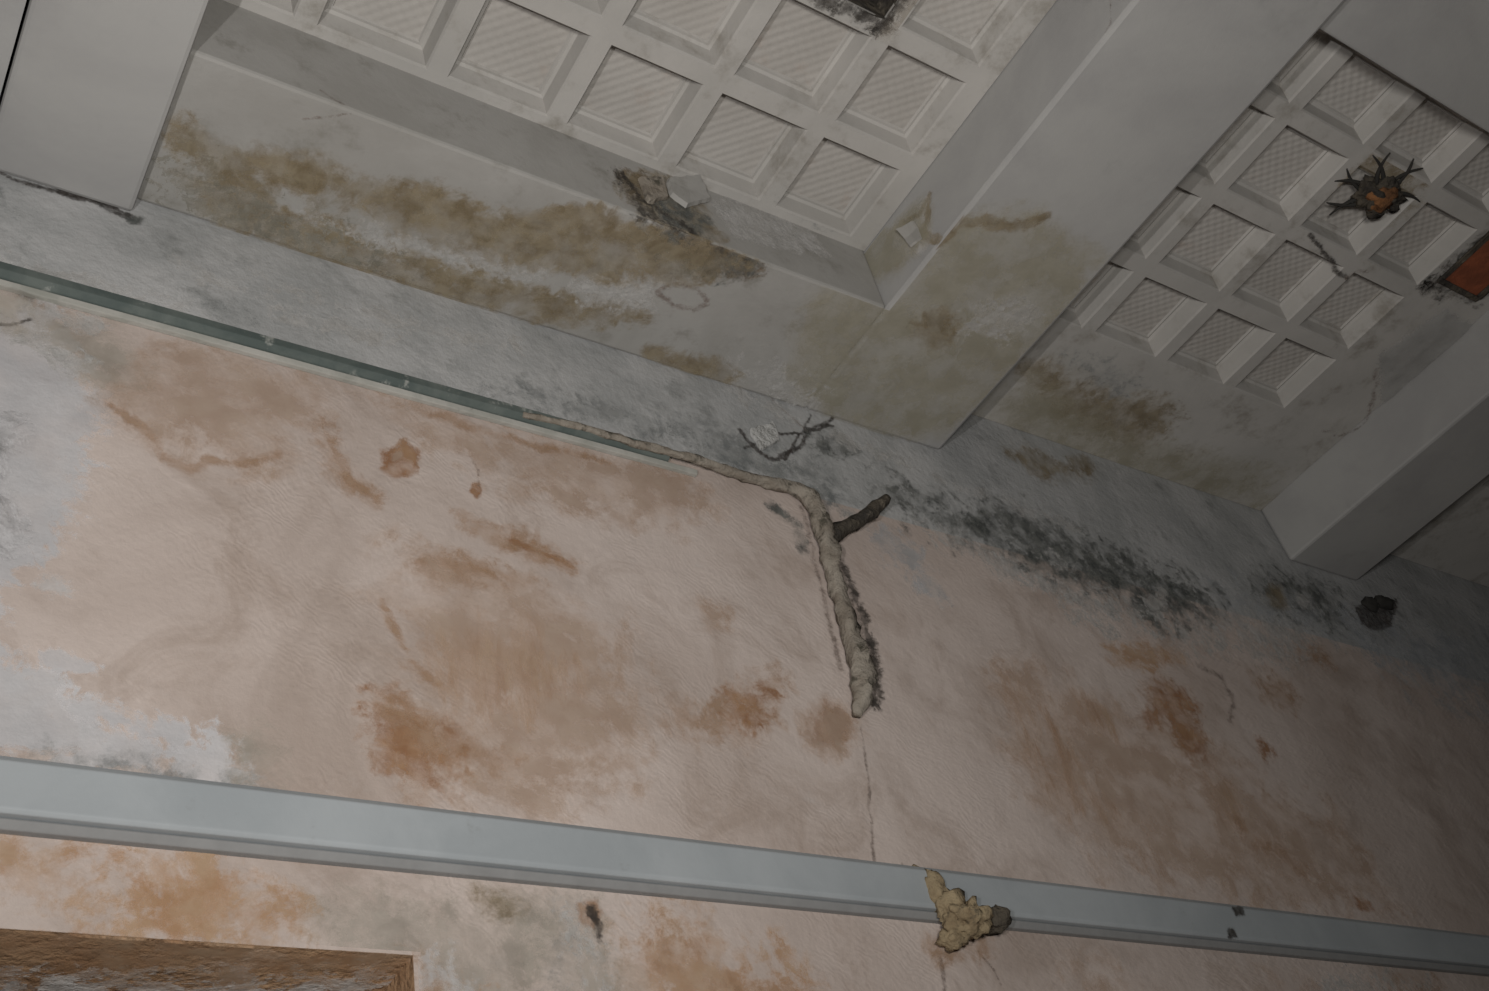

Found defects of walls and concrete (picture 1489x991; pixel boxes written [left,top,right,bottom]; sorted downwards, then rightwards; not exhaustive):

spalling [815,0,918,35]
damp [200,153,753,330]
spalling [615,168,830,305]
damp [110,350,303,477]
damp [643,209,1244,491]
damp [767,504,809,549]
damp [885,471,1230,640]
damp [994,663,1371,910]
peeling [3,963,109,991]
damp [98,852,258,986]
peeling [130,962,392,991]
damp [276,950,412,977]